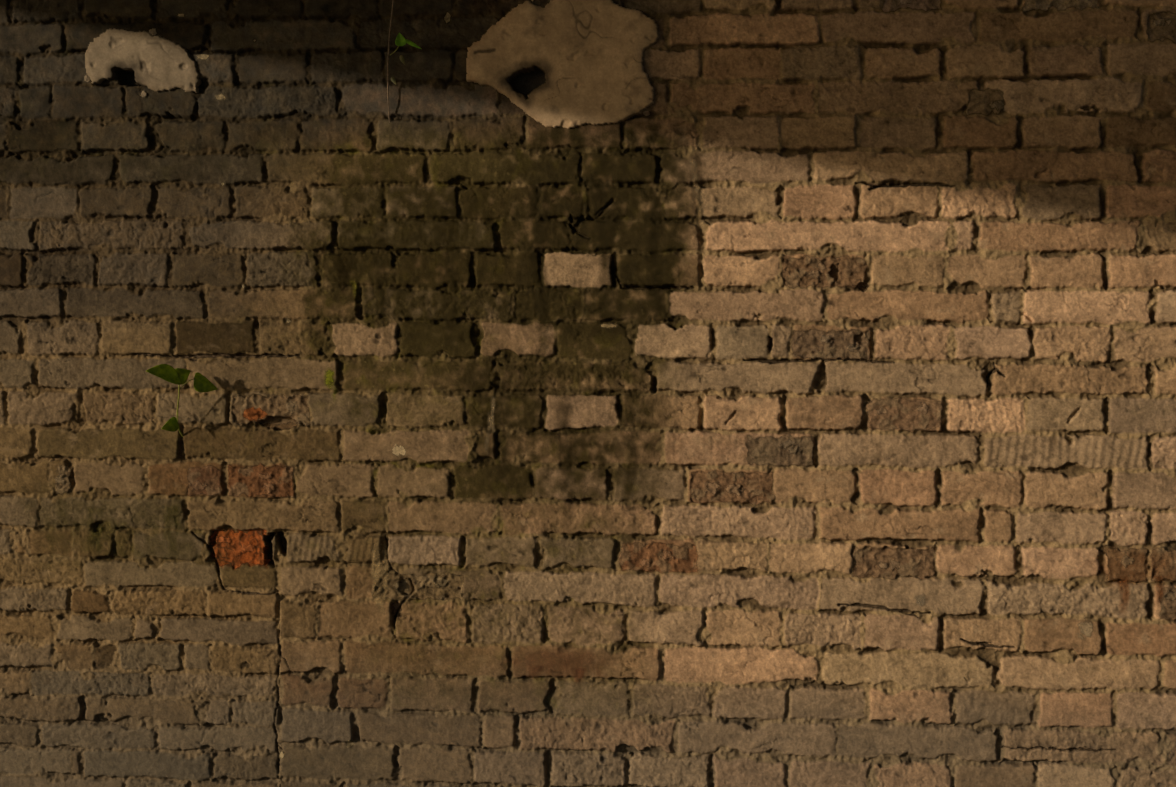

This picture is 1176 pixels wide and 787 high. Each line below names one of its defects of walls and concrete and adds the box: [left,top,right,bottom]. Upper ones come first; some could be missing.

crack [393,598,407,634]
crack [274,624,289,787]